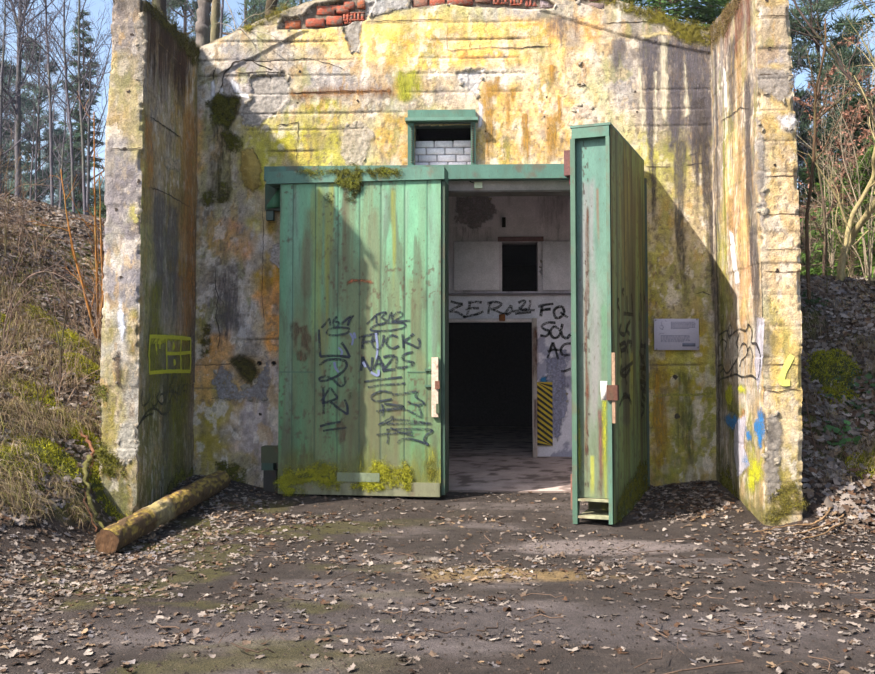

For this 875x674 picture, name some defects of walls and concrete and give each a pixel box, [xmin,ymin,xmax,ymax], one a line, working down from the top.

rust [147,11,192,109]
crack [213,58,341,92]
spalling [277,0,557,54]
water stain [613,38,625,68]
water stain [637,32,764,477]